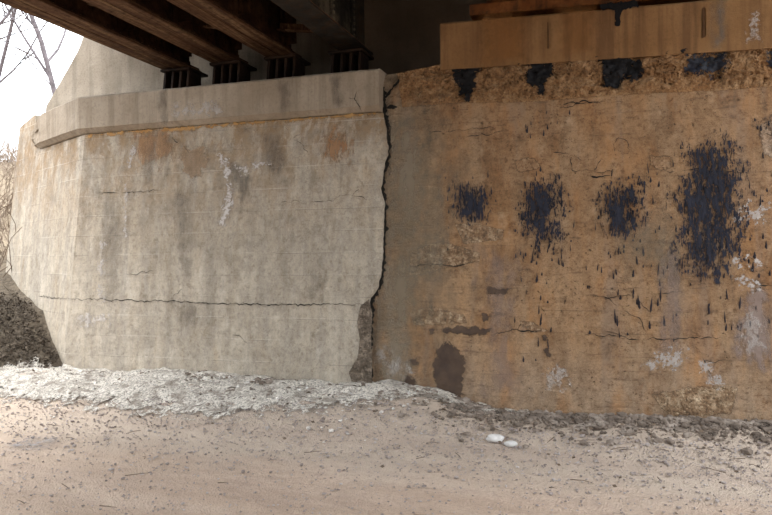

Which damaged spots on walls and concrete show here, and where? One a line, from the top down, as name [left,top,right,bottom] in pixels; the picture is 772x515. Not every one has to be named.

spalling [397,49,772,107]
water stain [622,58,645,83]
crack [40,76,400,381]
water stain [373,112,443,386]
efflorescence [733,200,770,225]
spalling [349,300,372,383]
water stain [429,313,491,398]